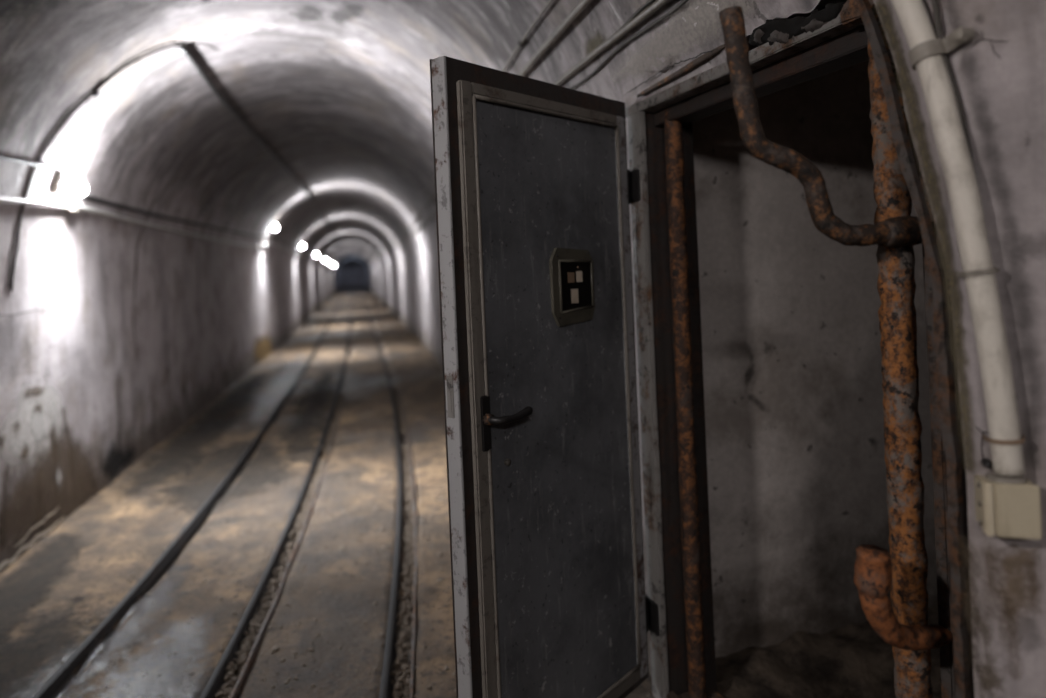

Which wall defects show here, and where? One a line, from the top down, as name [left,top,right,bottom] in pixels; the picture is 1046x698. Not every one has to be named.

spalling [749,2,846,46]
damp [1,408,135,550]
damp [11,556,214,698]